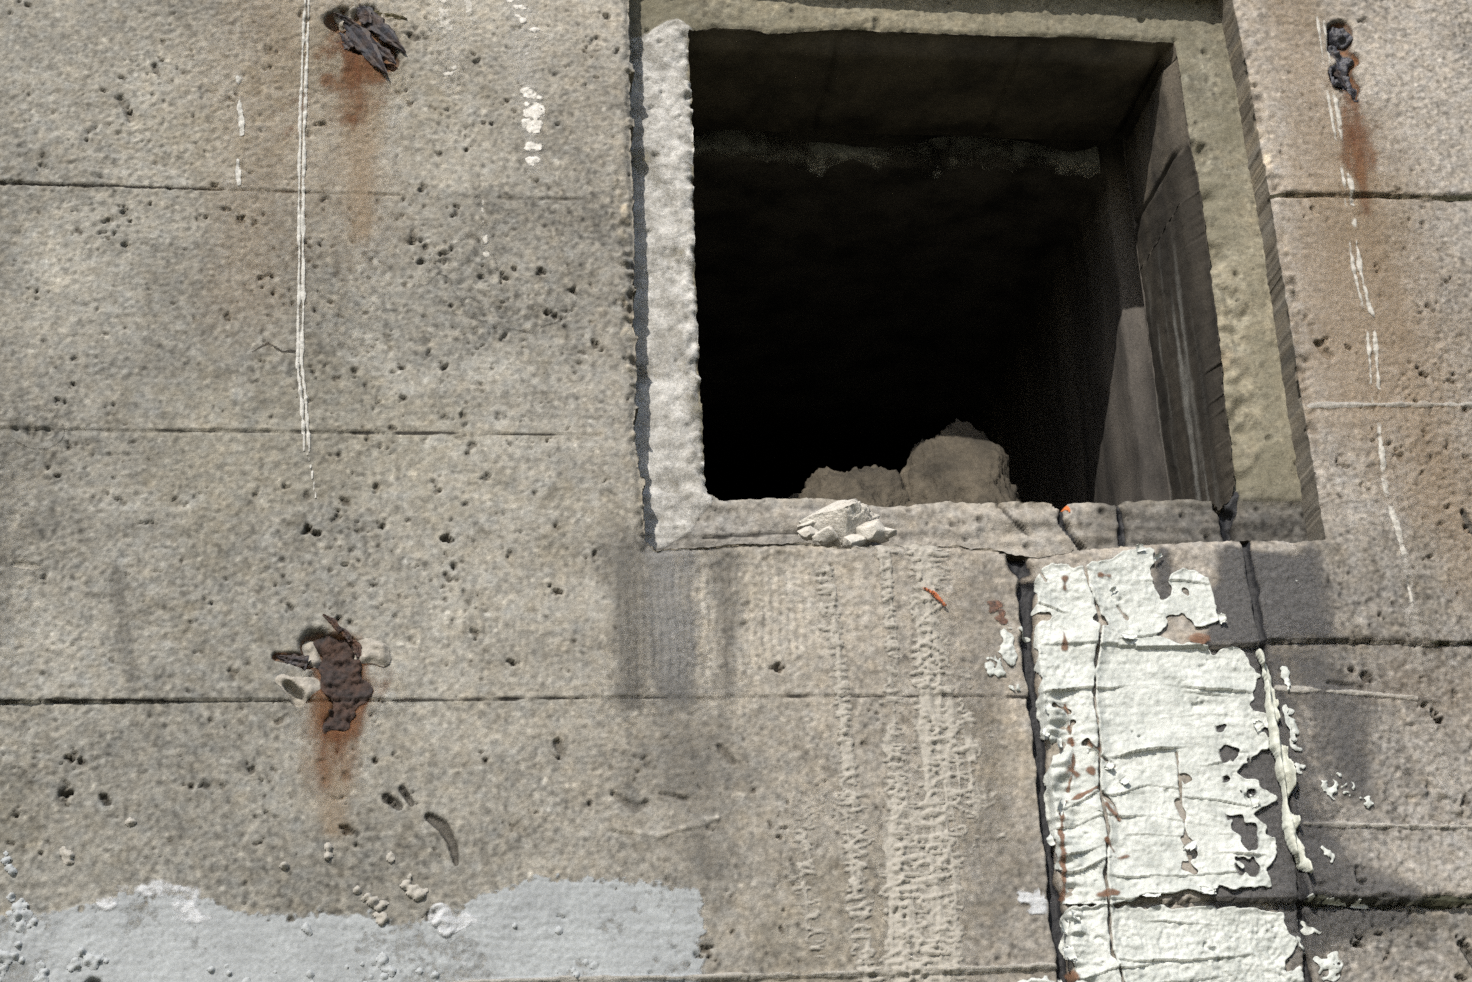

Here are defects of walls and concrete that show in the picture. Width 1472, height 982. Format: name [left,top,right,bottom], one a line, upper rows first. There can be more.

corrosion [324,41,382,108]
corrosion [1343,93,1374,180]
corrosion [319,677,365,771]
peeling [985,543,1321,982]
peeling [1321,772,1374,808]
peeling [1308,893,1368,909]